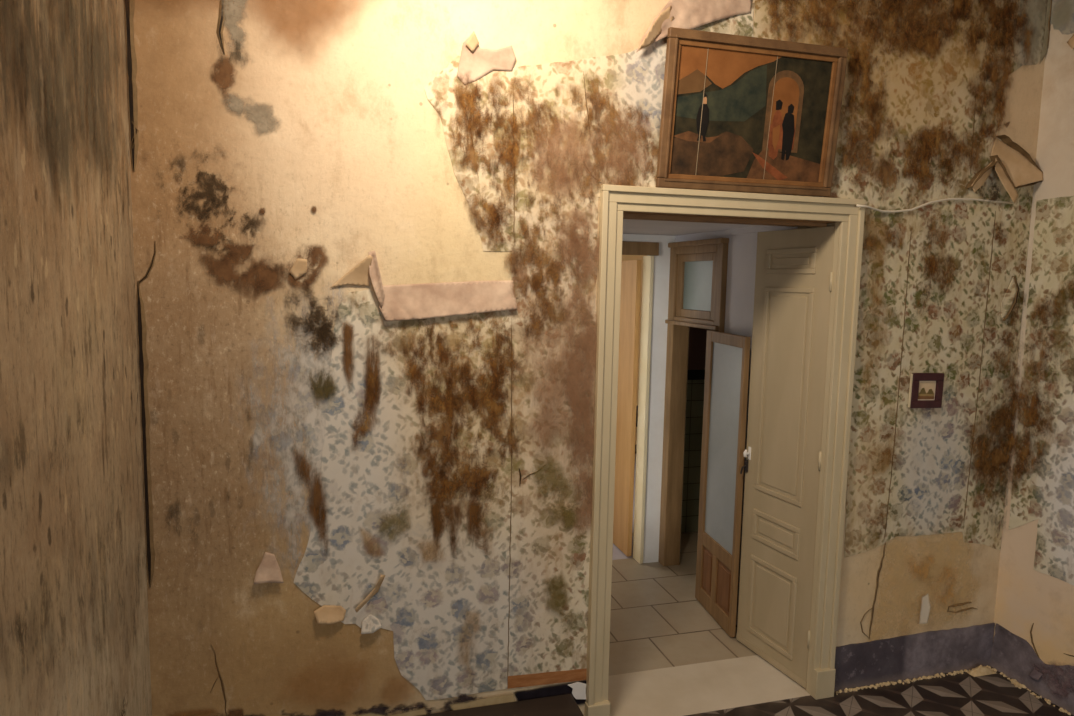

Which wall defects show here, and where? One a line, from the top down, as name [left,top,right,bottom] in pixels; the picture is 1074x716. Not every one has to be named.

leakage [262,0,342,38]
leakage [0,0,119,196]
spalling [211,0,278,133]
leakage [172,159,261,256]
leakage [286,288,339,354]
leakage [310,371,336,399]
leakage [535,462,575,527]
leakage [547,576,573,627]
spalling [568,682,586,699]